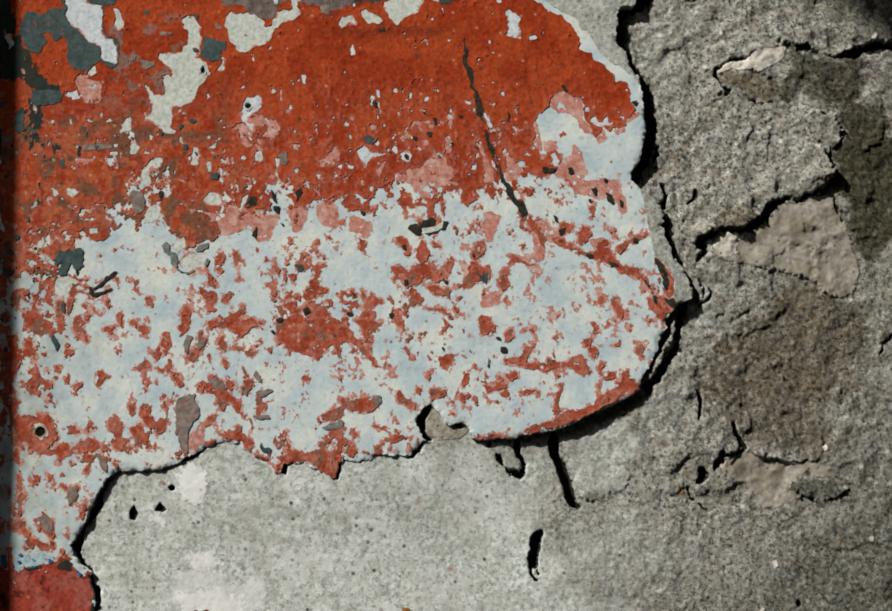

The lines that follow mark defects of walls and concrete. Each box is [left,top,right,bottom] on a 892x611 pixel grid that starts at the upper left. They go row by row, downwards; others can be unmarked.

peeling [1,89,80,143]
peeling [4,0,124,76]
peeling [129,0,300,140]
peeling [338,0,423,32]
peeling [496,0,537,42]
crack [616,0,659,184]
crack [796,41,892,60]
crack [641,185,843,393]
peeling [0,100,676,581]
crack [488,438,526,479]
crack [547,432,580,509]
crack [713,422,747,471]